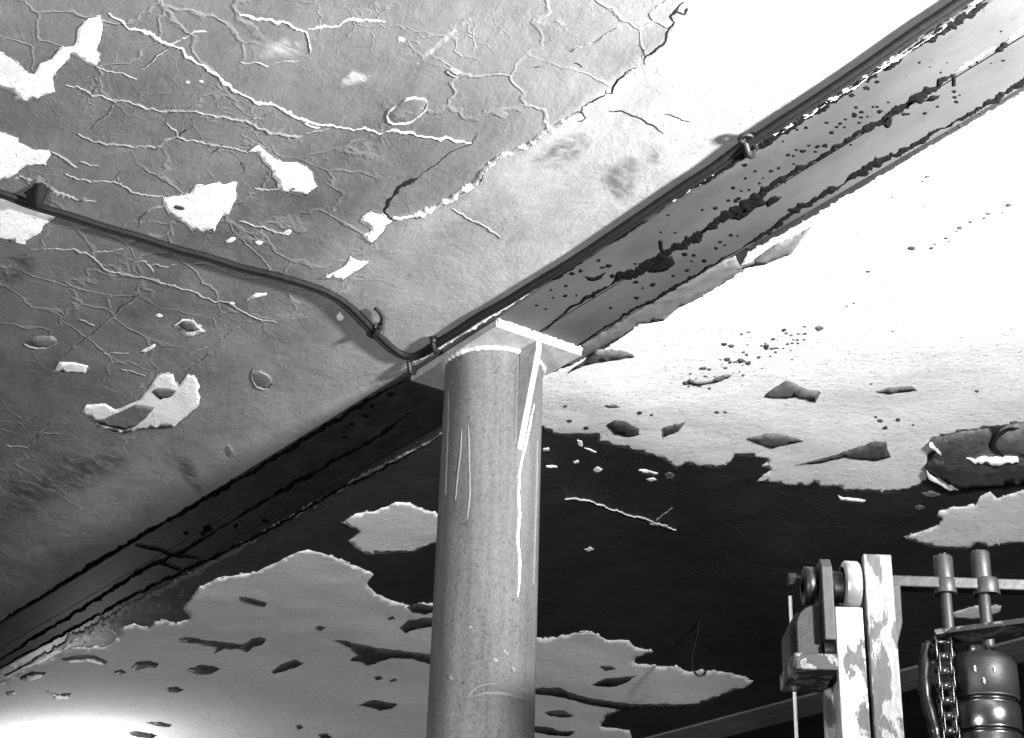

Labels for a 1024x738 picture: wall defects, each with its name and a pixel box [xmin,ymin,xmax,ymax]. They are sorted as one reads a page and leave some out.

peeling [0,15,105,102]
peeling [0,198,57,246]
peeling [0,130,96,202]
peeling [162,180,238,234]
peeling [247,144,318,197]
crack [44,2,690,377]
spalling [542,91,1024,550]
crack [6,422,66,449]
peeling [81,372,202,435]
crack [565,497,676,531]
spalling [0,432,442,738]
spalling [534,631,753,738]